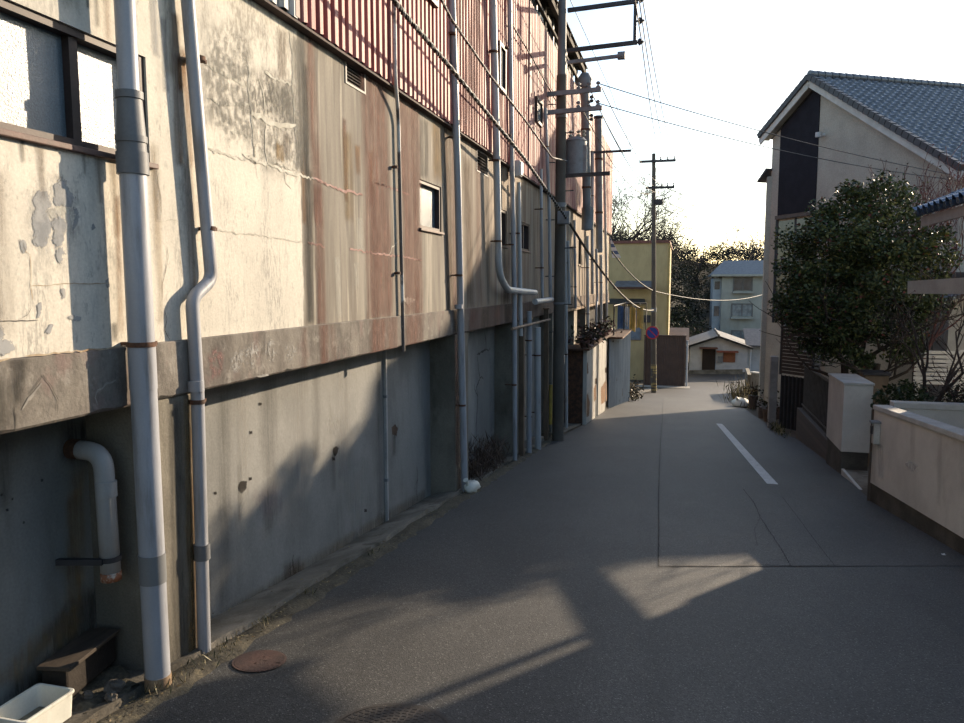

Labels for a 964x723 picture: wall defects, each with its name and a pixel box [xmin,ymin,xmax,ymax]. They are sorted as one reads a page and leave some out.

water stain [208,41,307,169]
peeling [20,179,79,264]
crack [243,154,408,195]
rust [343,76,394,352]
peeling [0,326,15,356]
water stain [10,589,97,700]